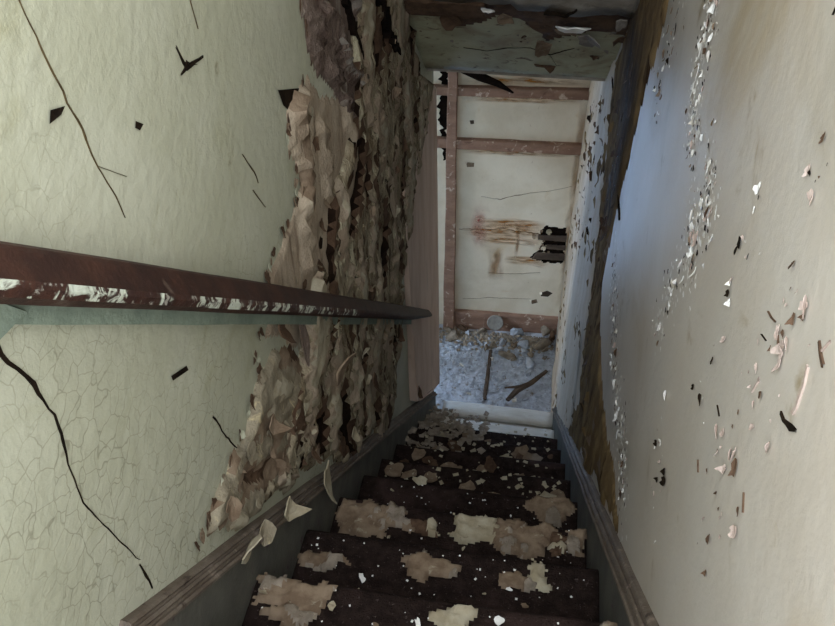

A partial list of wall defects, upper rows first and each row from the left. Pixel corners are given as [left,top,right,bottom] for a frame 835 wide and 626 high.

crack [18,0,127,218]
crack [0,346,153,589]
peeling [194,316,587,593]
peeling [264,0,684,540]
peeling [652,0,722,352]
peeling [697,405,737,477]
peeling [697,492,745,544]
peeling [757,287,808,373]
flaking render [769,364,810,432]
flaking render [808,340,831,368]